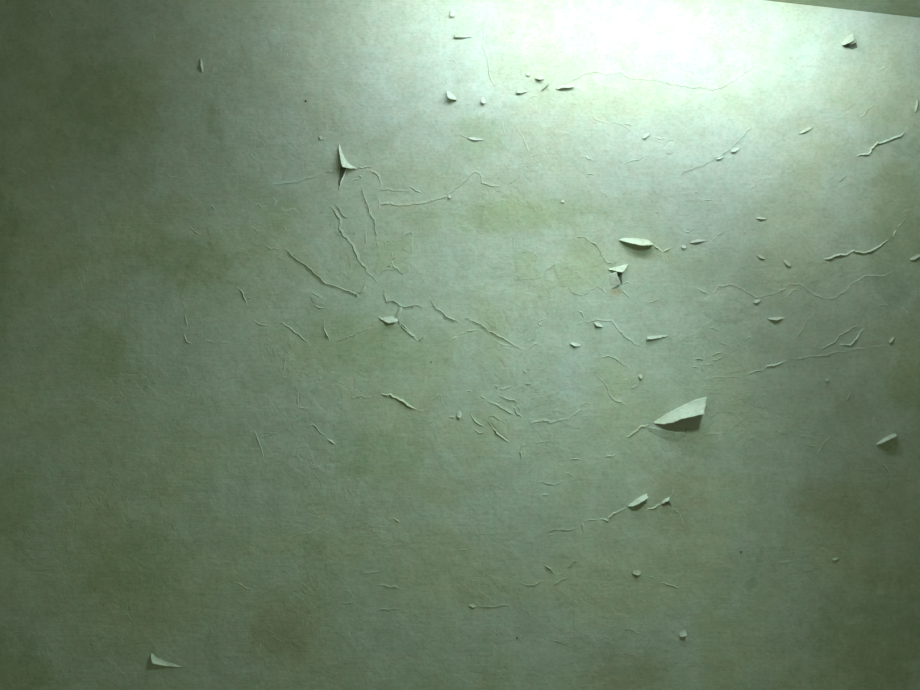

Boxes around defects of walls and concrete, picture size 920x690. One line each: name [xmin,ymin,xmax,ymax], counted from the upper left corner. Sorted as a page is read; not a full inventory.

peeling [842,33,861,53]
peeling [270,143,379,189]
crack [680,125,753,176]
crack [837,130,907,190]
peeling [619,238,705,265]
crack [237,169,594,434]
peeling [608,264,640,299]
crack [695,208,911,379]
peeling [625,397,707,442]
peeling [600,489,683,524]
crack [478,560,578,621]
peeling [151,653,181,667]